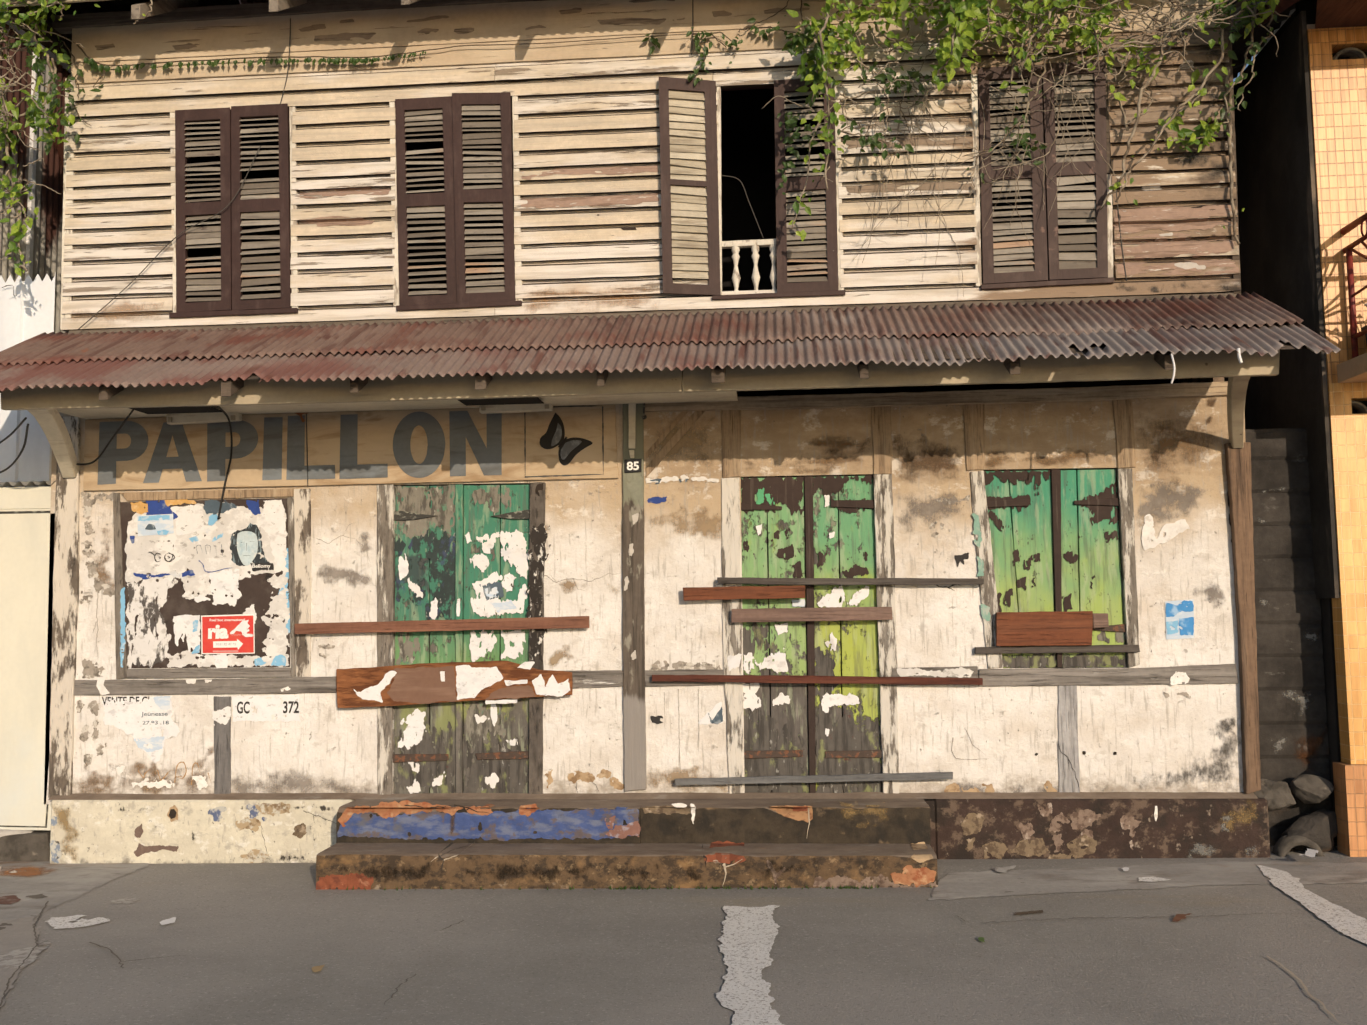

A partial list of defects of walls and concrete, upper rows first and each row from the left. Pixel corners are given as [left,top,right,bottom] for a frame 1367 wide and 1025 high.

peeling [394,484,456,620]
peeling [526,523,551,662]
peeling [741,474,873,578]
leakage [894,440,956,475]
leakage [905,495,958,523]
peeling [933,469,1051,576]
leakage [1026,451,1090,465]
leakage [1139,399,1216,519]
peeling [337,699,691,841]
peeling [744,646,883,834]
leakage [344,865,430,882]
leakage [497,864,584,879]